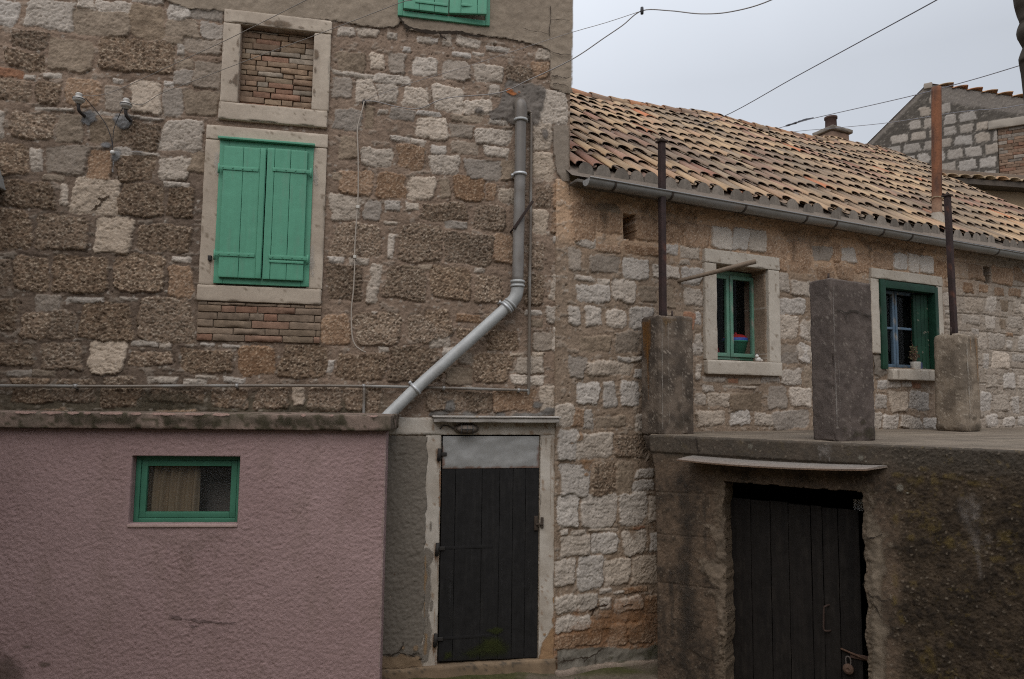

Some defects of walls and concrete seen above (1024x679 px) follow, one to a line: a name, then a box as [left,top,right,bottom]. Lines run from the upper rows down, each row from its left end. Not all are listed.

crack [169,615,236,628]